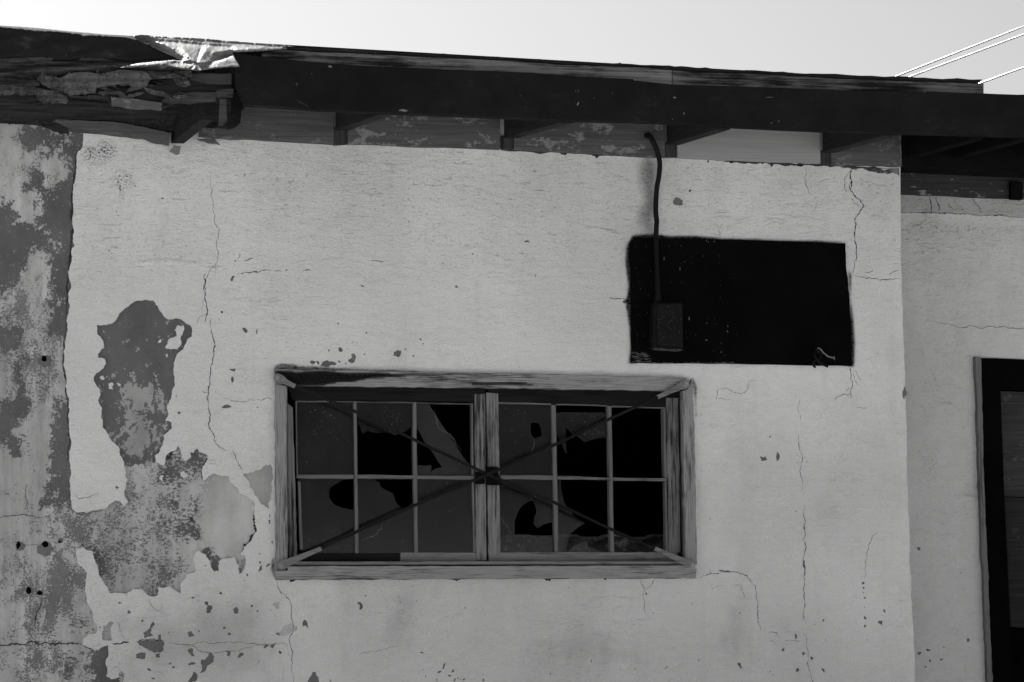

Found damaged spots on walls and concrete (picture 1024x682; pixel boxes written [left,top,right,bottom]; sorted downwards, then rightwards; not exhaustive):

peeling [0,124,83,461]
peeling [16,300,273,590]
flaking render [136,620,174,679]
flaking render [187,630,214,682]
crack [197,179,271,467]
crack [698,401,813,682]
crack [844,170,899,280]
crack [926,295,1023,329]